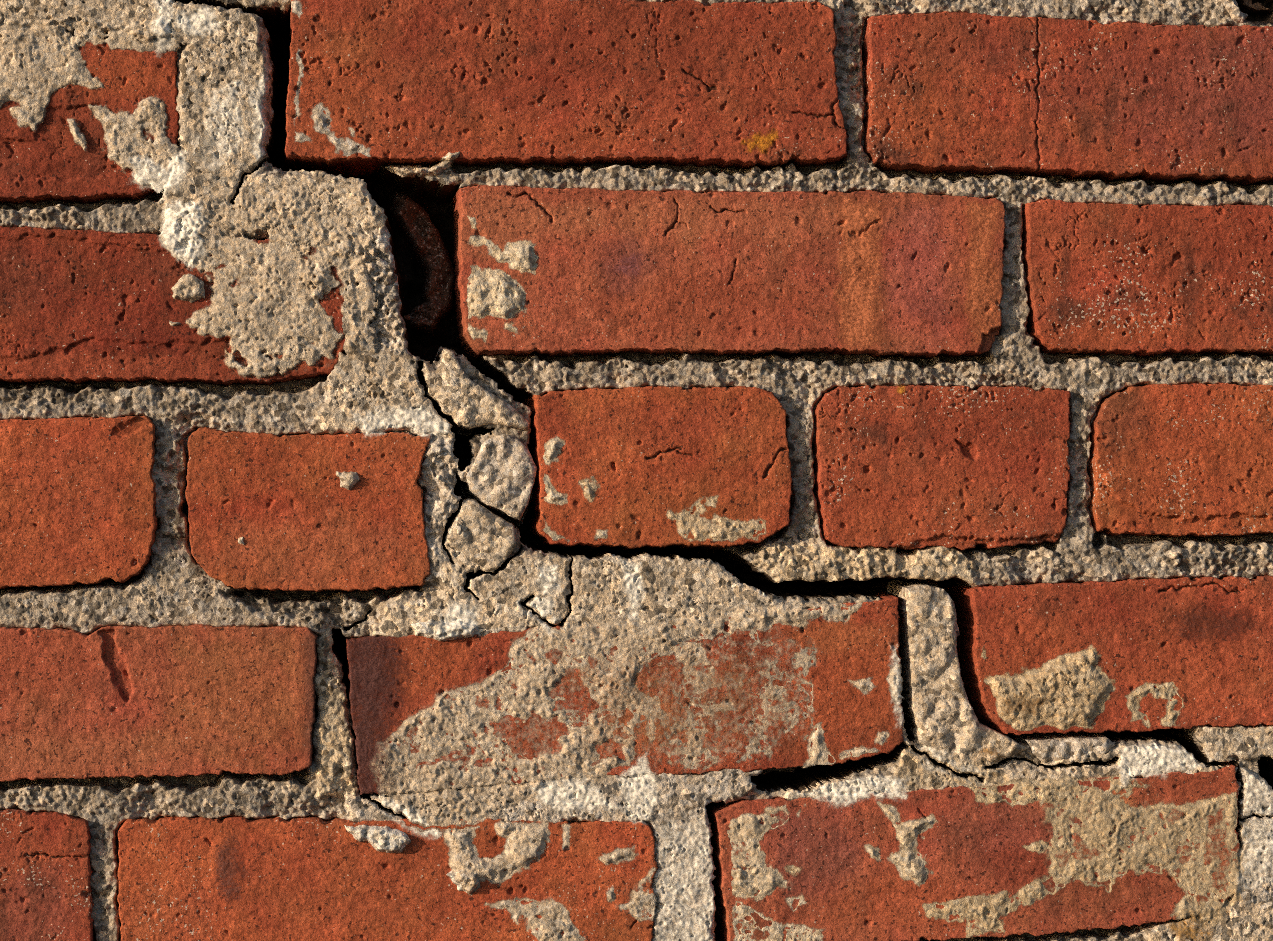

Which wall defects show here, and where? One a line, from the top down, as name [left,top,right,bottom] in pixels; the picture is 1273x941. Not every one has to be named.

spalling [0,97,185,191]
crack [174,0,293,205]
crack [1033,17,1041,173]
spalling [0,337,288,386]
peeling [336,254,380,354]
crack [326,166,973,626]
crack [332,611,371,738]
peeling [653,600,863,671]
crack [356,776,404,818]
peeling [799,722,889,768]
crack [751,689,1273,843]
peeling [727,804,823,941]